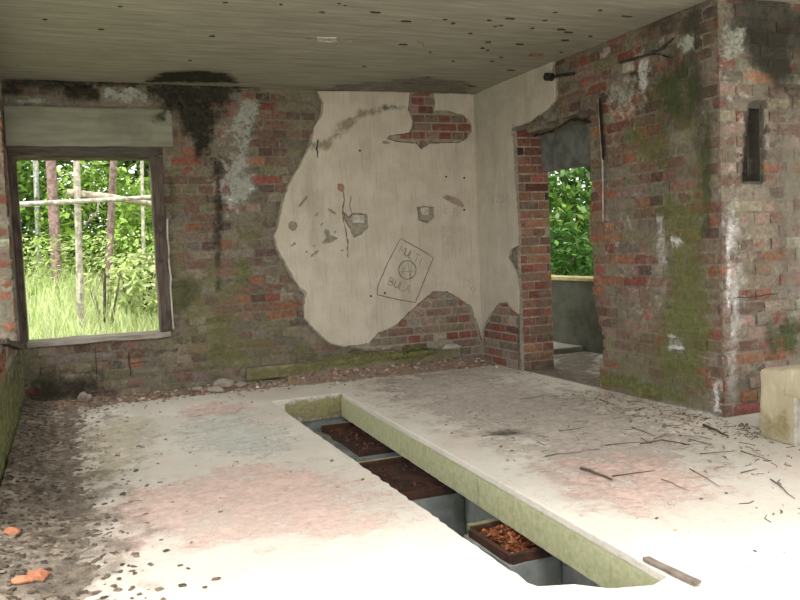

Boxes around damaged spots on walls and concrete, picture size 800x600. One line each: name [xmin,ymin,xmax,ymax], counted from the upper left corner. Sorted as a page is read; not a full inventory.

damp [723,24,744,59]
damp [4,71,240,156]
flaking render [387,83,472,149]
damp [700,113,711,233]
damp [214,157,222,266]
crack [342,191,352,257]
damp [657,216,683,262]
flaking render [345,291,521,370]
damp [668,334,684,353]